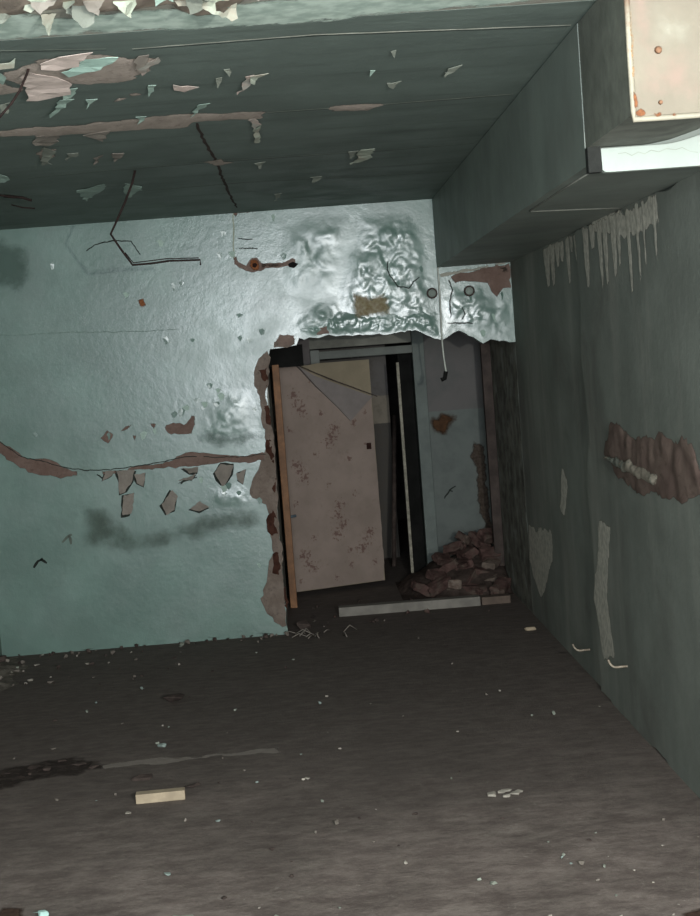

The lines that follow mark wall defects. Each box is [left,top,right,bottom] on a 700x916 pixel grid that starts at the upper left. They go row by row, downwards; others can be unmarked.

peeling [0,0,528,40]
peeling [0,52,269,166]
corrosion [633,92,661,117]
peeling [76,184,106,201]
corrosion [232,212,298,272]
flaking render [440,263,511,299]
flaking render [0,335,295,627]